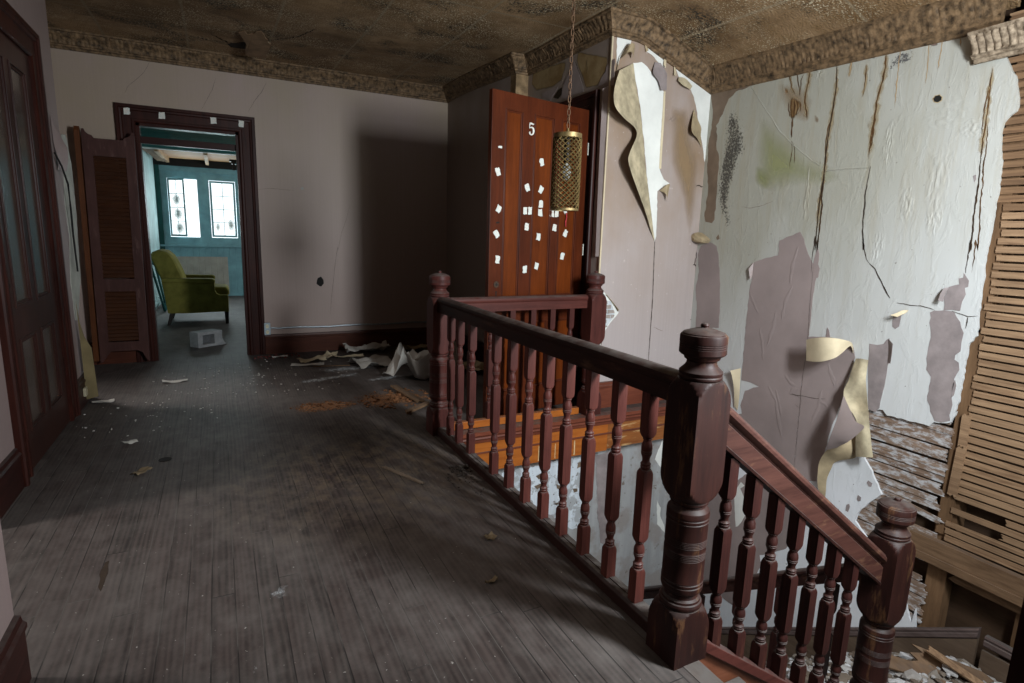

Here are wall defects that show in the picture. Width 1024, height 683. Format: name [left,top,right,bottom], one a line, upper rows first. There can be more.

peeling [614,37,711,242]
leakage [719,113,743,223]
rust [786,72,811,161]
crack [811,75,837,268]
rust [862,56,888,152]
crack [862,166,974,326]
crack [966,145,983,267]